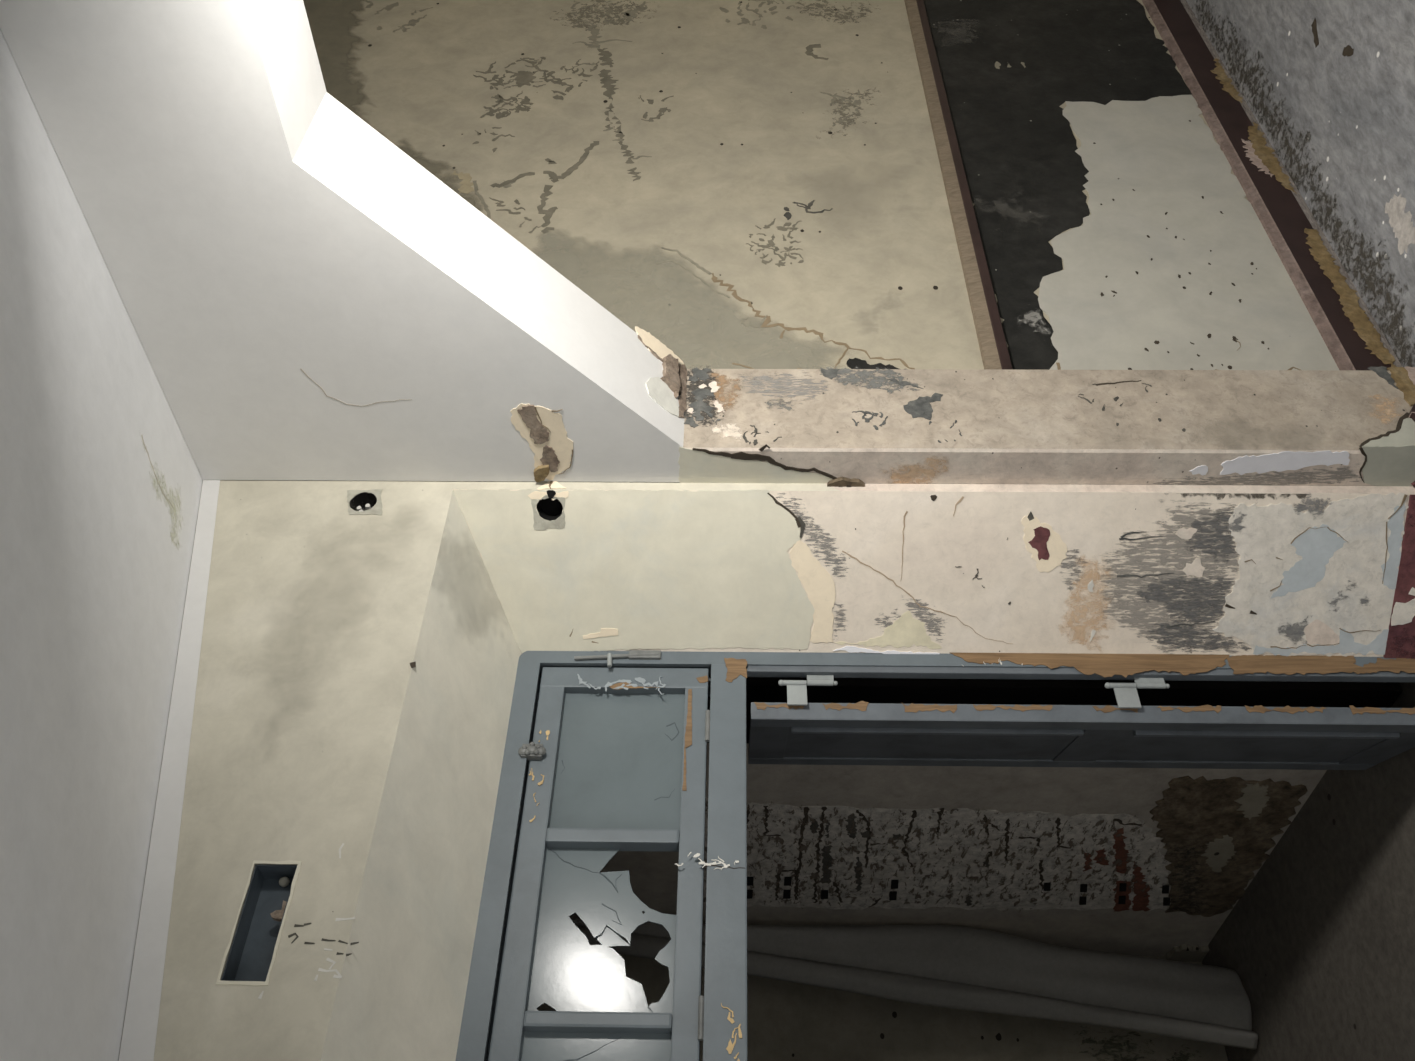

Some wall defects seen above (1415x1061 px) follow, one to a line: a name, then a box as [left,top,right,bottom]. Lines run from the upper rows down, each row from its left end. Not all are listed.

leakage [303,0,365,115]
leakage [397,146,481,210]
peeling [453,0,656,234]
peeling [747,200,833,267]
peeling [923,0,1339,426]
crack [300,369,412,407]
leakage [537,233,830,425]
crack [656,247,915,369]
crack [693,444,837,479]
peeling [453,228,1415,682]
peeling [577,674,666,695]
flaking render [675,776,1308,917]